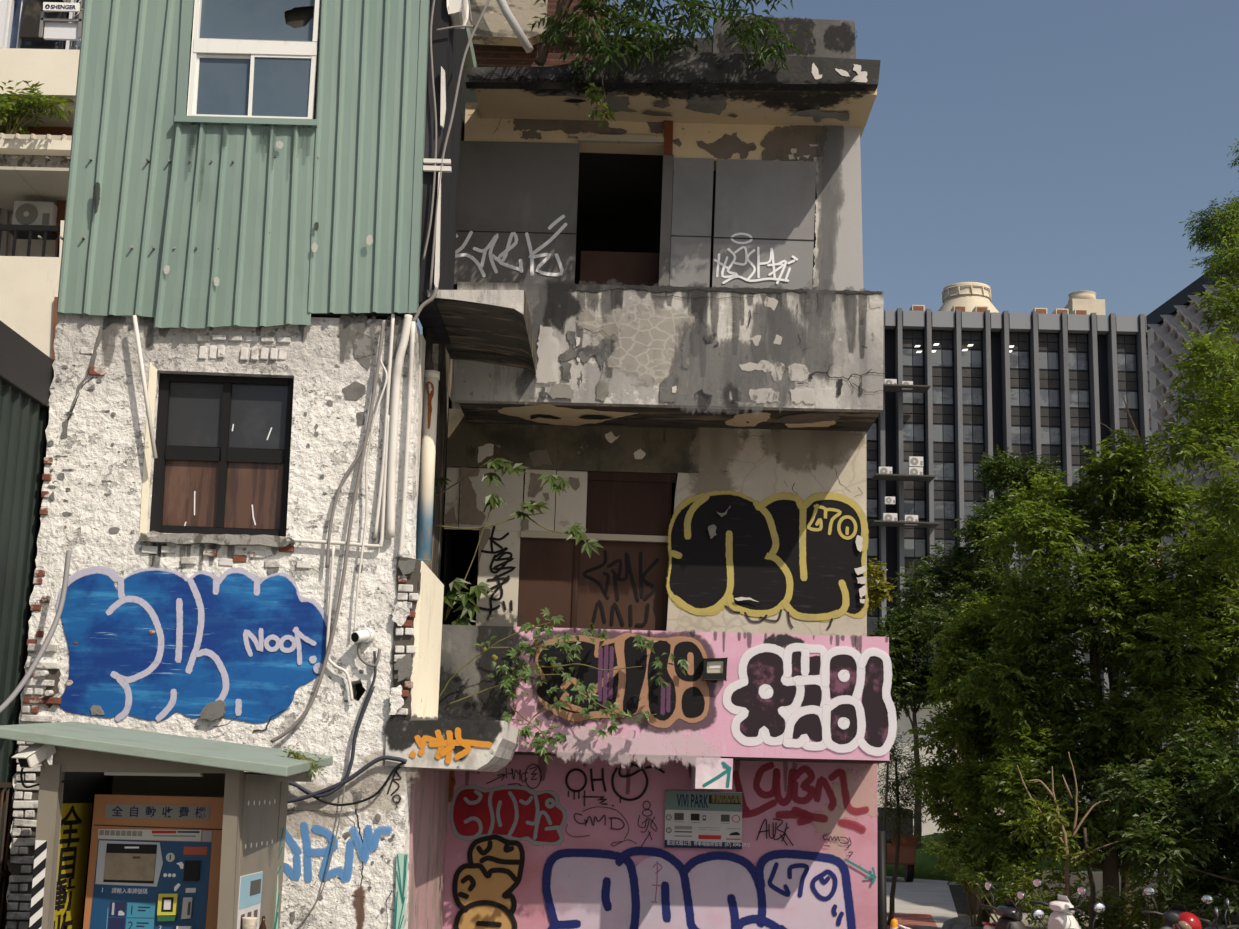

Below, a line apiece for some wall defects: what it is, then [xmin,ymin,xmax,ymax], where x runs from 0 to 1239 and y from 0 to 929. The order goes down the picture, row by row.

water stain [467,73,875,113]
peeling [513,85,850,282]
water stain [669,125,845,415]
water stain [102,315,170,366]
flaking render [197,335,291,361]
water stain [339,313,403,361]
water stain [516,273,580,405]
peeling [498,325,638,443]
spalling [725,360,840,428]
crack [796,346,885,394]
flaking render [141,544,311,575]
flaking render [6,741,41,929]